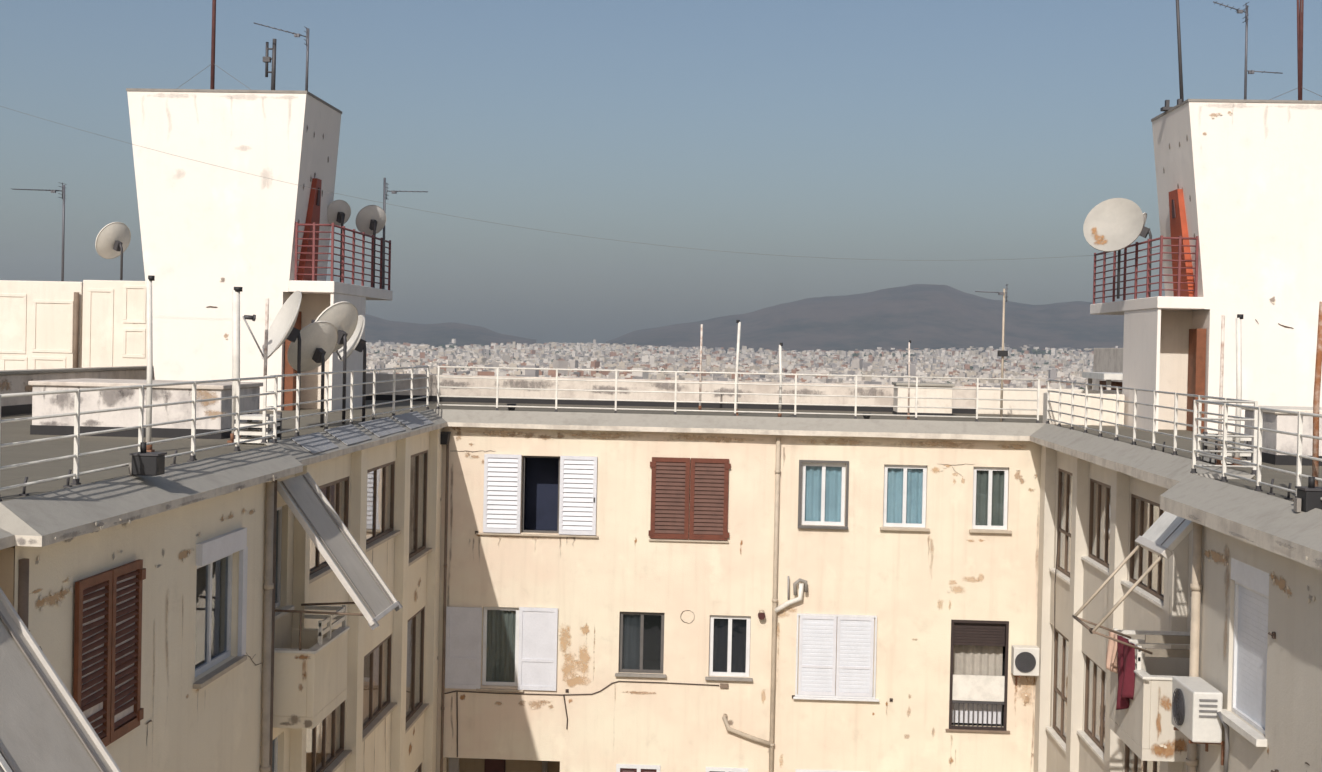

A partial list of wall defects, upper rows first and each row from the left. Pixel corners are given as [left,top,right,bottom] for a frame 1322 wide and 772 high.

peeling [558,624,595,686]